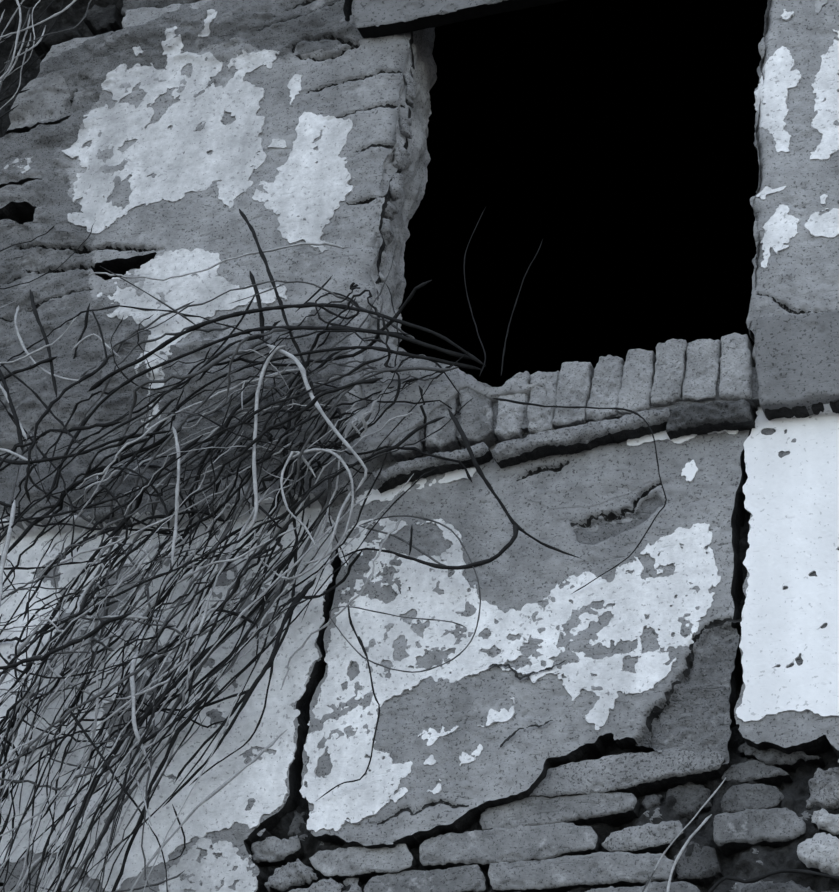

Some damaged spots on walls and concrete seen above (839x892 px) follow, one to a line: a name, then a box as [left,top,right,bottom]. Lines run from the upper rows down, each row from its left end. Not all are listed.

peeling [781,9,794,21]
peeling [62,26,354,253]
peeling [756,186,787,200]
peeling [754,46,802,153]
peeling [760,194,839,269]
peeling [810,29,839,161]
spalling [0,403,839,892]
crack [646,510,751,747]
crack [300,786,309,809]